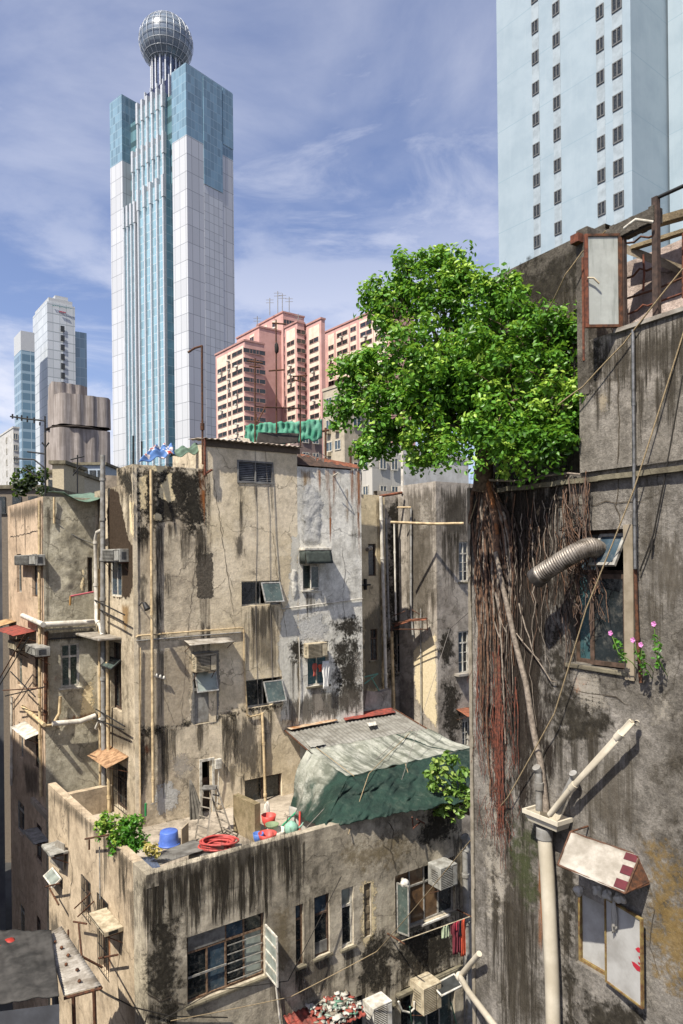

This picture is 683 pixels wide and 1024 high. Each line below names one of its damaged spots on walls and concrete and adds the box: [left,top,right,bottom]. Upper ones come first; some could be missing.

leakage [589,317,683,425]
corrosion [304,470,360,533]
leakage [112,464,472,796]
leakage [479,469,646,1024]
leakage [54,791,463,1024]